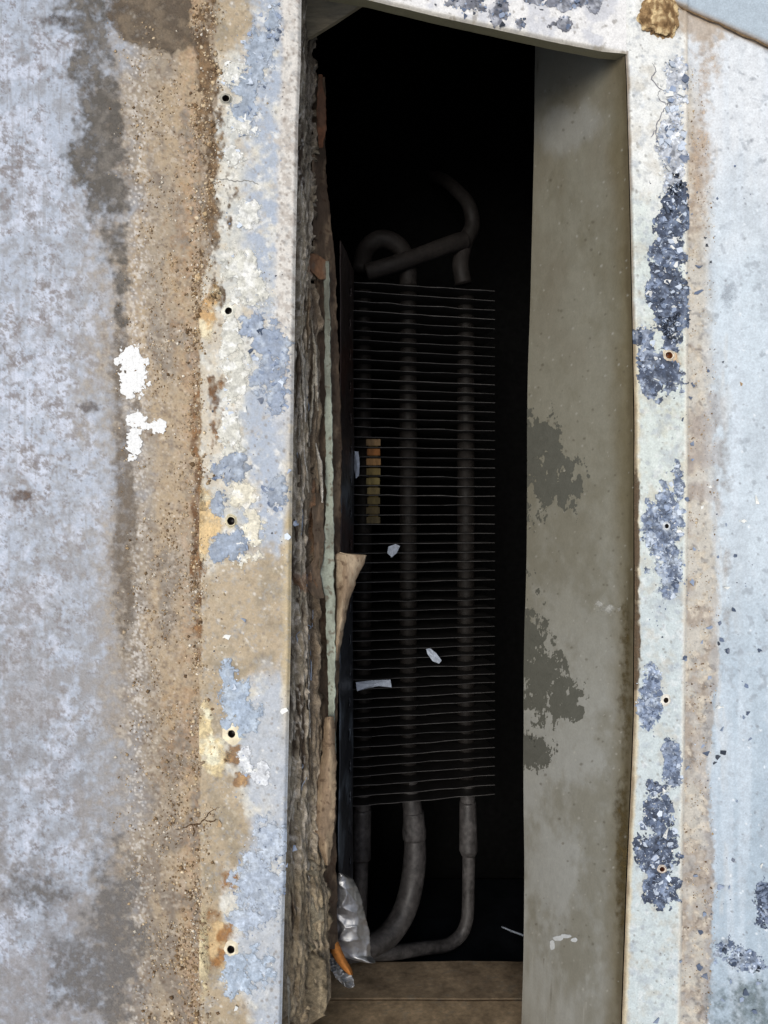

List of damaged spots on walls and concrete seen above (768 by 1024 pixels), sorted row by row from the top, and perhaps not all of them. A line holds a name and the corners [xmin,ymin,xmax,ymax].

corrosion [190,376,224,577]
corrosion [199,277,226,338]
corrosion [192,0,237,264]
peeling [208,241,295,569]
peeling [639,459,704,600]
peeling [633,54,712,405]
crack [177,807,220,836]
corrosion [199,911,232,989]
corrosion [199,703,250,787]
peeling [217,658,270,786]
peeling [219,812,297,1011]
peeling [632,661,698,912]